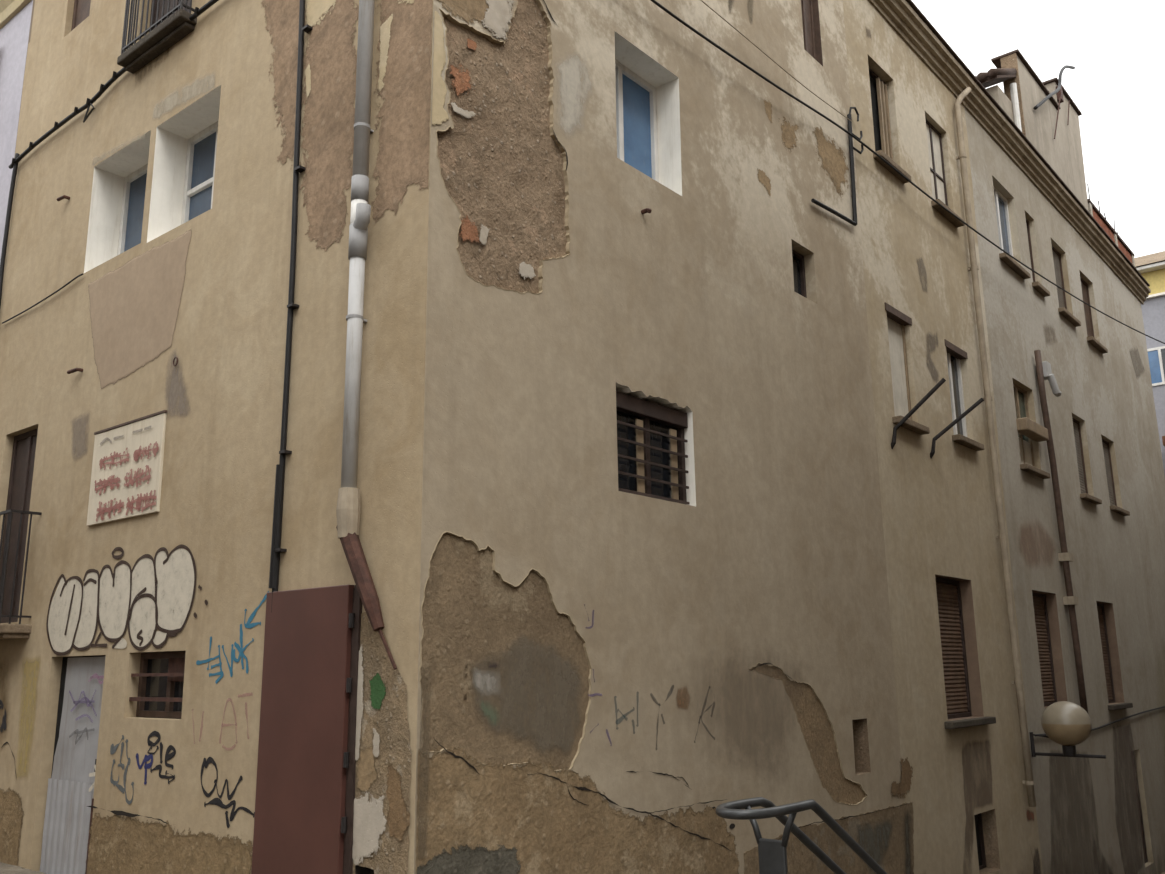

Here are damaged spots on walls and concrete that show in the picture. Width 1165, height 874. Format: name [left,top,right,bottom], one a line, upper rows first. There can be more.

peeling [261,0,359,251]
flaking render [370,0,571,294]
flaking render [0,788,23,866]
flaking render [85,813,253,874]
crack [433,737,479,774]
flaking render [352,531,739,874]
crack [527,771,731,851]
flaking render [749,662,868,806]
peeling [891,757,914,798]
water stain [1034,725,1143,874]